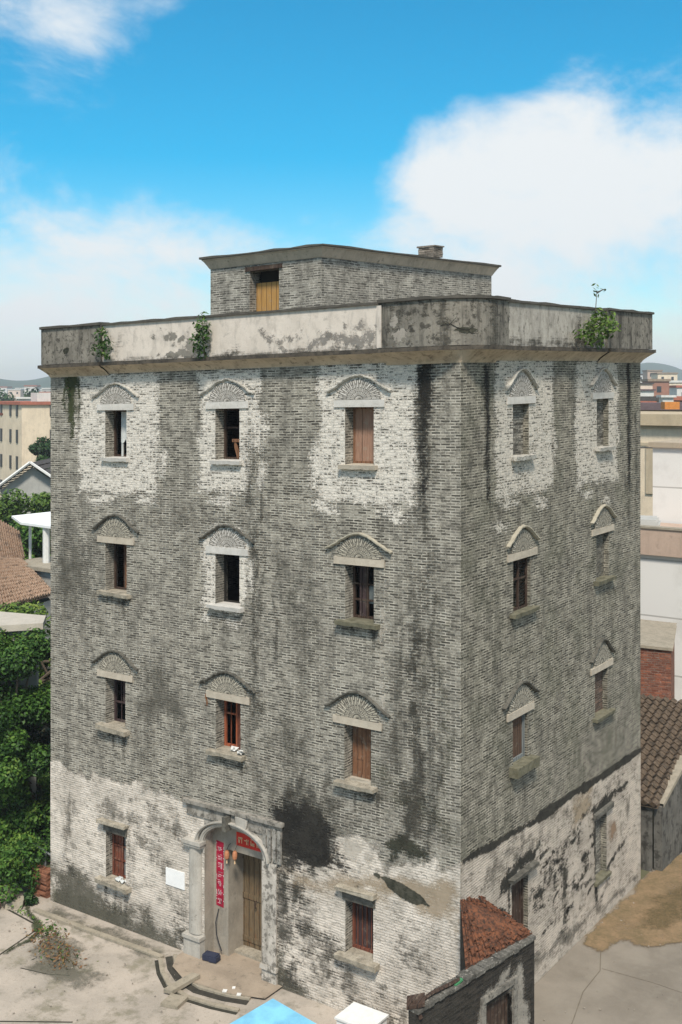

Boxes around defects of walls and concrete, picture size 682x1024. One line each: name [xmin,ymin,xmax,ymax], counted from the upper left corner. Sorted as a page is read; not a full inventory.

spalling [259,313,407,352]
spalling [437,322,478,334]
leakage [62,377,139,418]
leakage [407,364,442,533]
leakage [482,364,492,505]
leakage [50,858,187,950]
spalling [373,873,430,906]